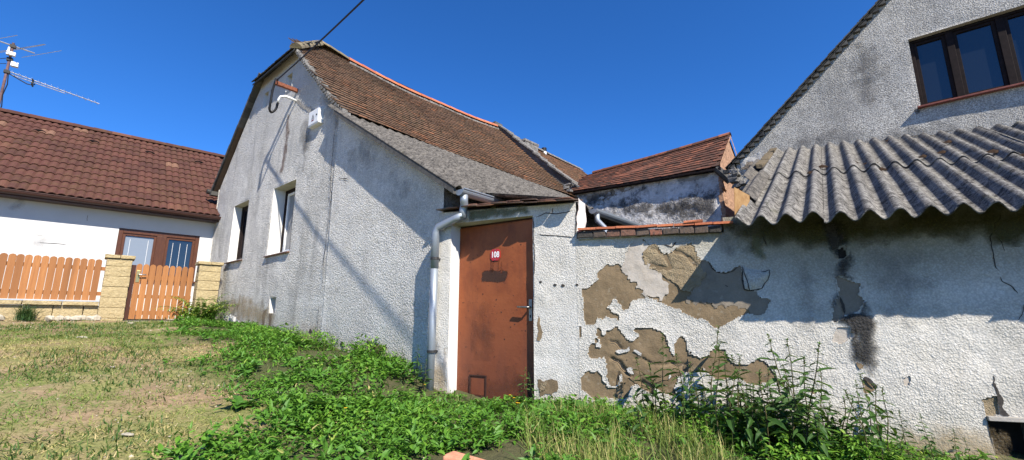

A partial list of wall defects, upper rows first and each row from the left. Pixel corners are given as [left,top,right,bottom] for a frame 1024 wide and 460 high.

damp [589,187,715,218]
spalling [538,237,776,400]
damp [823,223,878,393]
crack [989,213,1024,320]